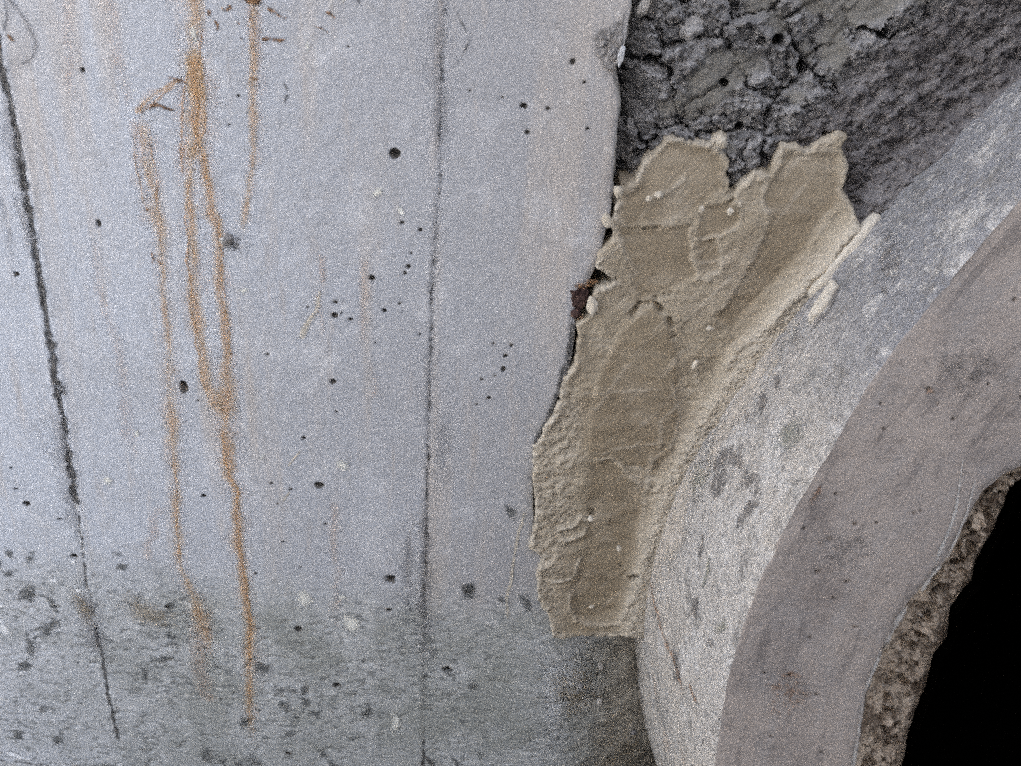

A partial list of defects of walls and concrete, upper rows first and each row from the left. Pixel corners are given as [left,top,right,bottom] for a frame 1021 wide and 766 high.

crack [0,48,119,740]
spalling [570,267,598,319]
spalling [614,0,1021,324]
crack [421,737,434,766]